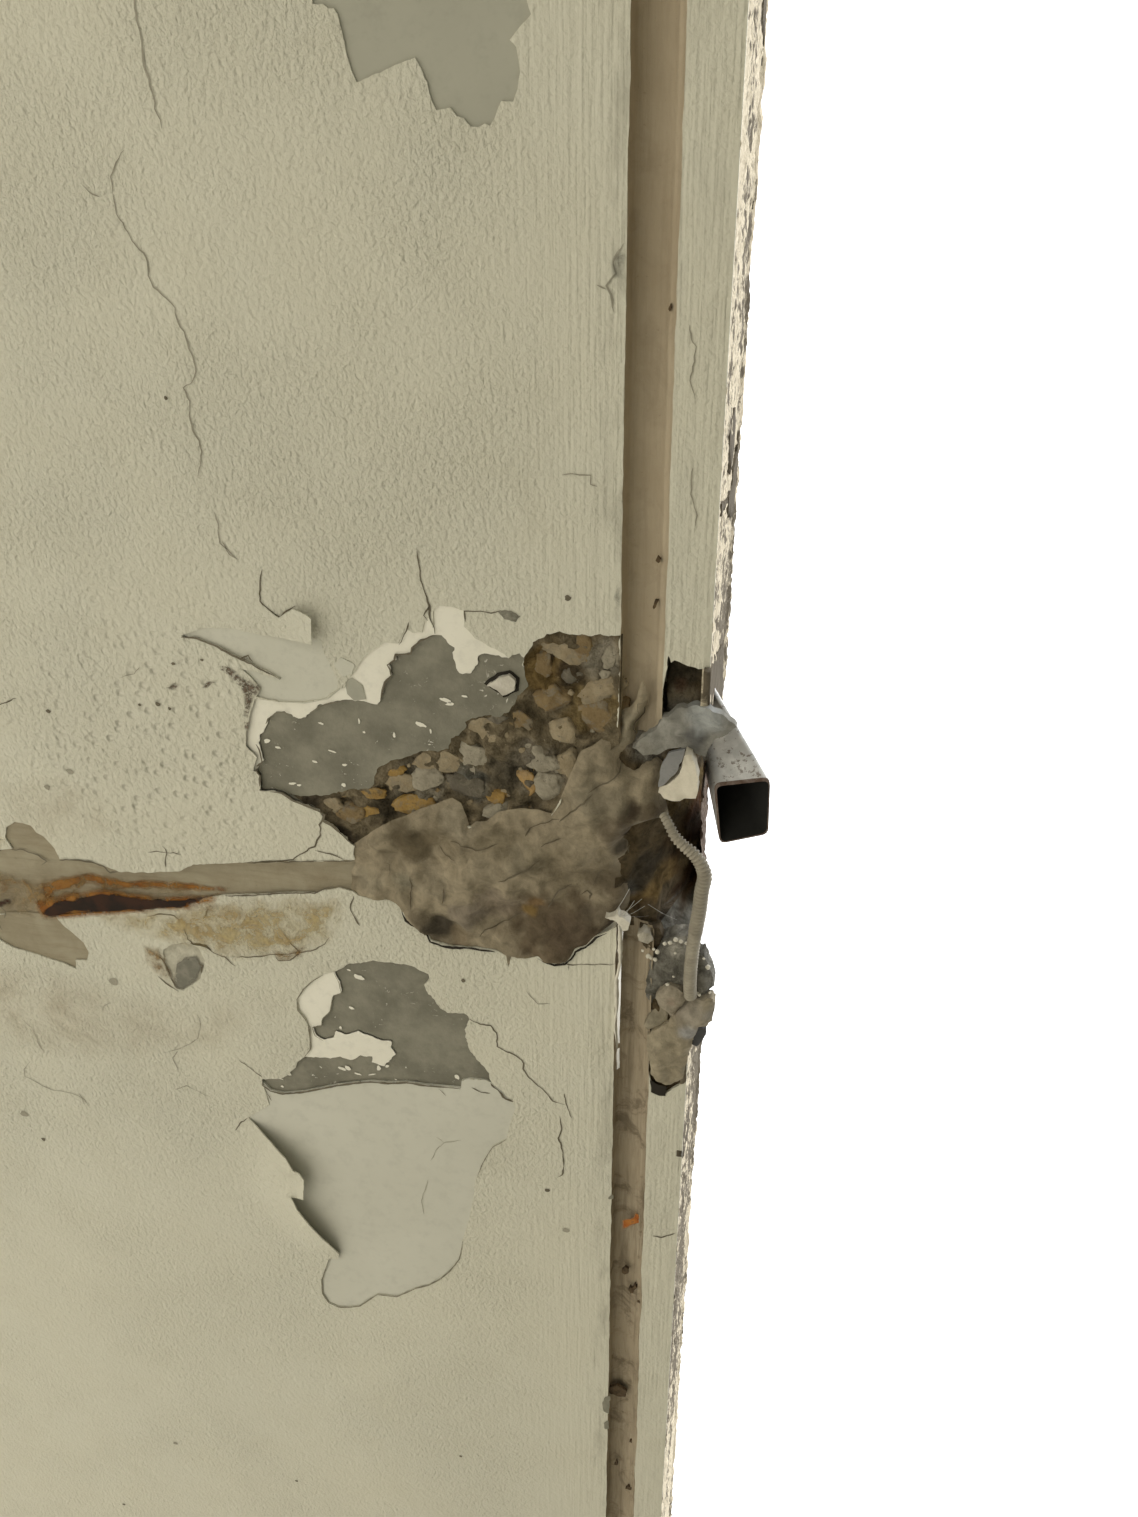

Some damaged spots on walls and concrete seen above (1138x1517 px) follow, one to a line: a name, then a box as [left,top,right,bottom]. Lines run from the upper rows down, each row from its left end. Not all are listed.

crack [134,0,162,129]
peeling [313,0,531,127]
crack [84,150,202,475]
spalling [662,640,724,716]
spalling [184,605,709,929]
peeling [0,822,62,860]
corrosion [36,874,223,917]
peeling [0,912,89,967]
spalling [154,942,212,990]
peeling [692,1026,706,1046]
spalling [649,1061,680,1091]
peeling [250,961,515,1308]